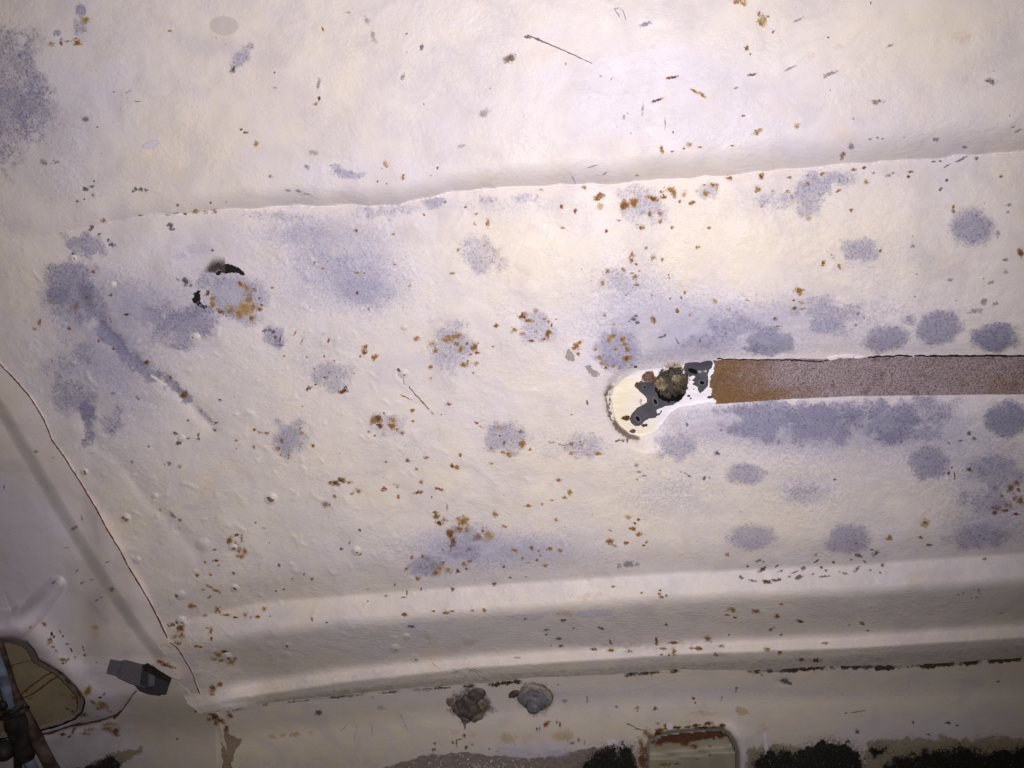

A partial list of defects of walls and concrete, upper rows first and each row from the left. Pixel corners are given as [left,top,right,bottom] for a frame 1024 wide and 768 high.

rust [618,175,732,230]
peeling [44,226,218,431]
peeling [152,272,283,350]
rust [204,281,262,321]
peeling [44,360,98,446]
peeling [565,312,976,480]
rust [709,354,1024,404]
rust [404,505,507,580]
mould [746,735,1024,768]